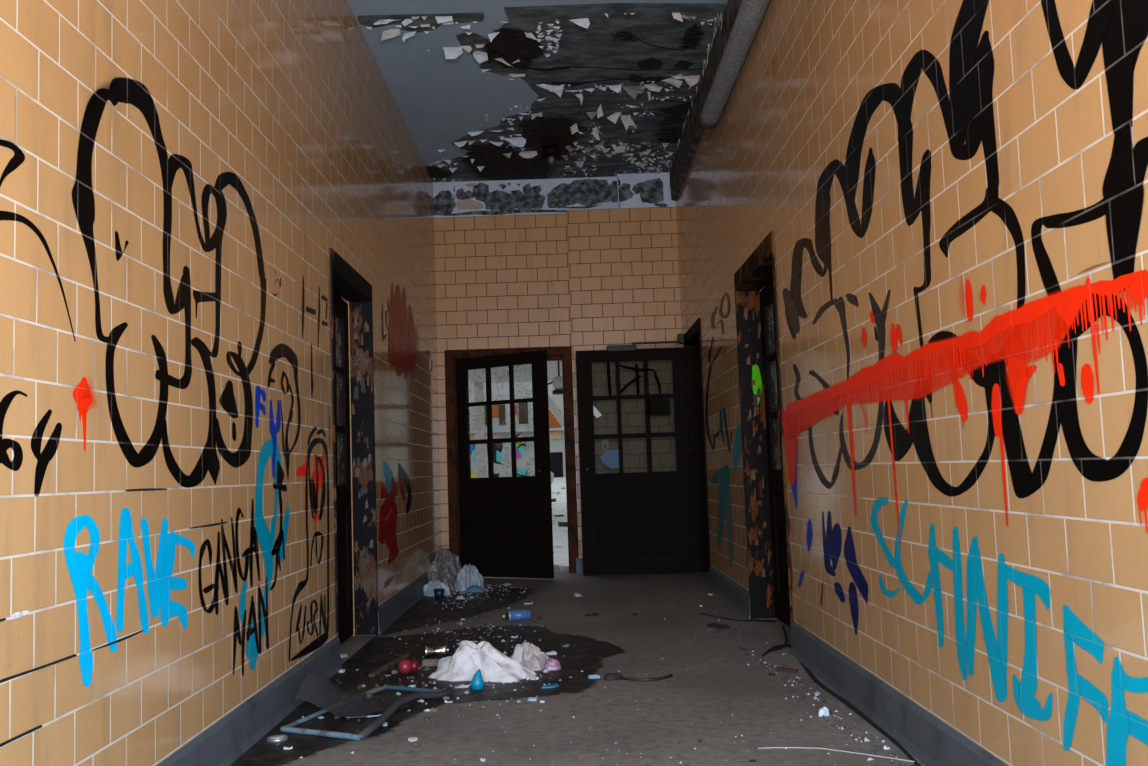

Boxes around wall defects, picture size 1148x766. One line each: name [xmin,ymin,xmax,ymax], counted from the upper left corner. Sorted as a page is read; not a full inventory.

spalling [358,3,726,209]
peeling [351,316,370,415]
peeling [743,308,761,365]
peeling [747,379,761,454]
peeling [353,437,371,524]